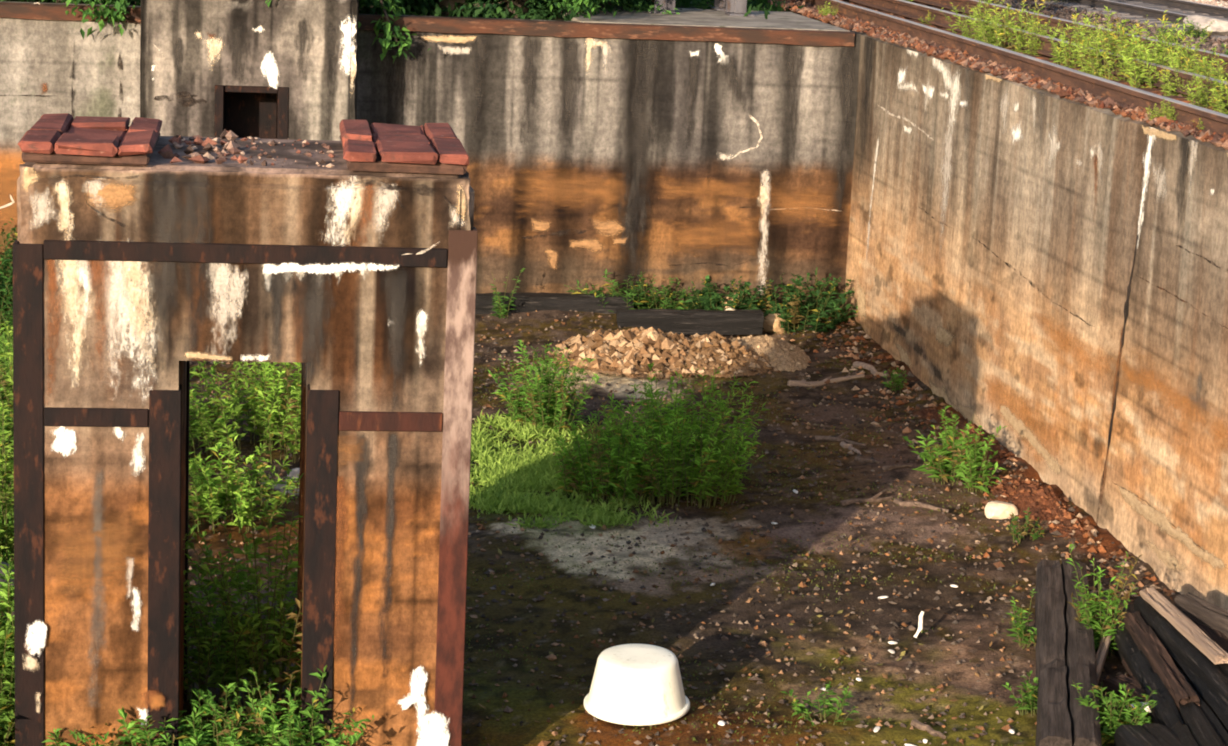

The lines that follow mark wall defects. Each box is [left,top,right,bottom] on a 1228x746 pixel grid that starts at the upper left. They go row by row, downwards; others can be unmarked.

water stain [261,51,278,89]
water stain [296,17,357,99]
efflorescence [55,180,73,241]
water stain [47,260,243,386]
water stain [263,245,435,382]
efflorescence [328,179,395,244]
efflorescence [758,172,769,291]
water stain [897,58,969,217]
crack [973,237,1092,326]
crack [1096,218,1228,525]
water stain [1138,127,1197,240]
corrosion [334,477,348,650]